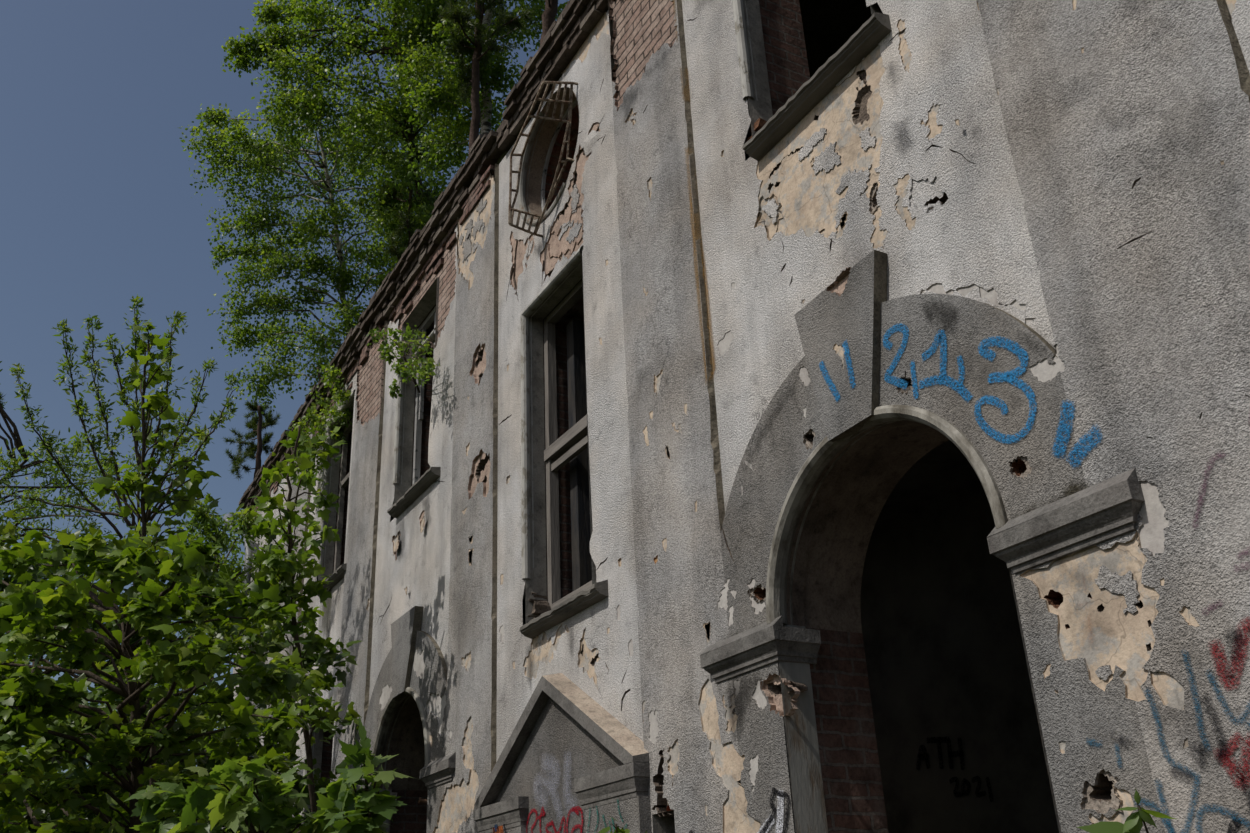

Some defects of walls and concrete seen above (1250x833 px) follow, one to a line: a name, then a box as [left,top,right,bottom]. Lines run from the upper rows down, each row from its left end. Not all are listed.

flaking render [897,19,912,72]
flaking render [510,122,600,295]
flaking render [754,45,948,249]
flaking render [920,103,960,142]
flaking render [356,173,495,426]
flaking render [462,442,490,514]
flaking render [379,684,392,710]
flaking render [413,648,427,679]
flaking render [425,688,479,833]
flaking render [717,578,766,626]
flaking render [698,673,808,833]
flaking render [1020,480,1184,710]